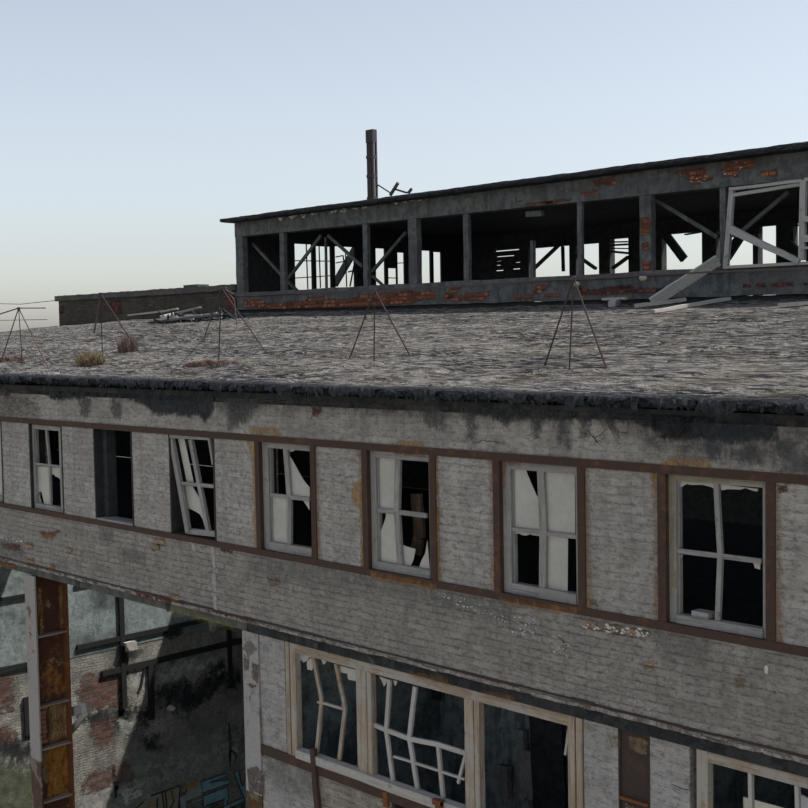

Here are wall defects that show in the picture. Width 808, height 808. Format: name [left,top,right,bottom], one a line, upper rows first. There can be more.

peeling [242,657,259,688]
corrosion [45,703,69,798]